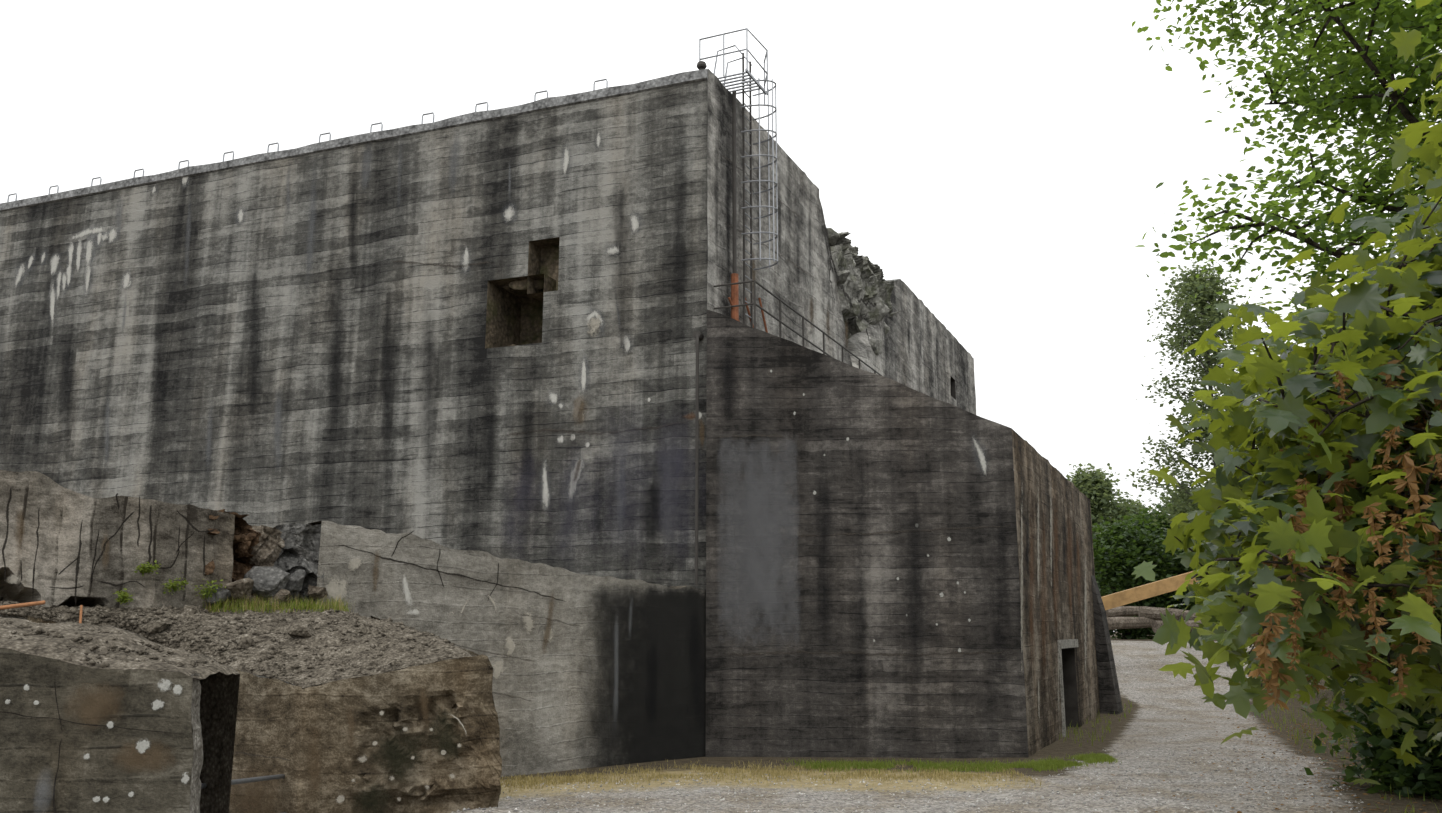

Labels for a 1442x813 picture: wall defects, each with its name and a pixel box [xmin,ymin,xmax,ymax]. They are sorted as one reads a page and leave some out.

damp [15,227,117,322]
damp [607,198,639,276]
damp [331,331,341,419]
damp [383,316,391,427]
damp [525,460,549,507]
damp [558,434,590,499]